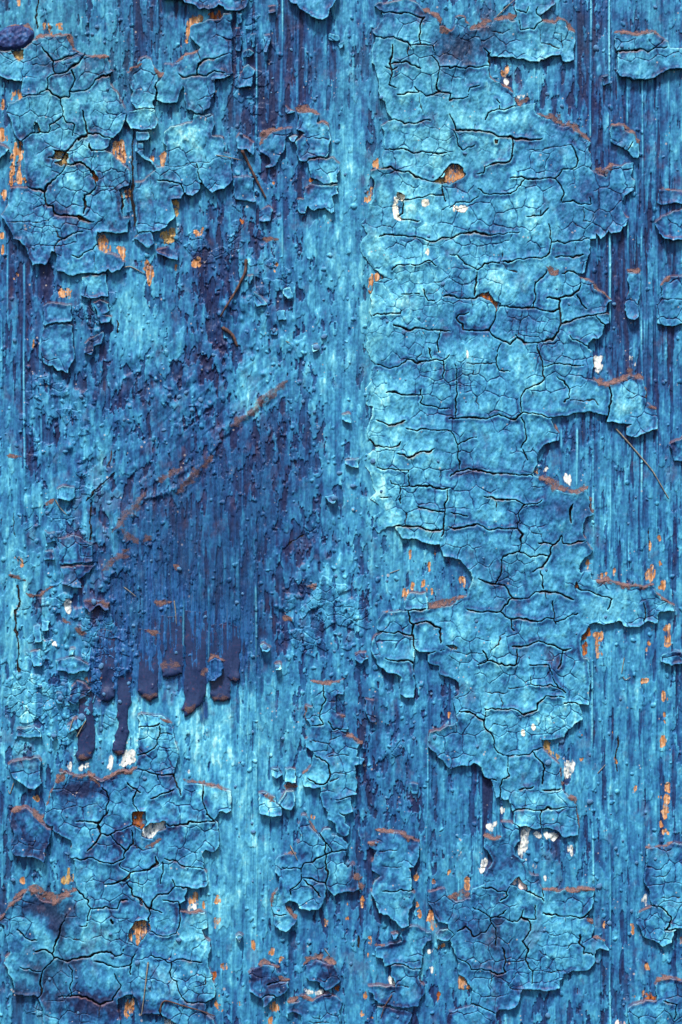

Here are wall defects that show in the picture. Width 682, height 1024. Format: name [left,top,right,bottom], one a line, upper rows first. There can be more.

crack [155,37,232,101]
crack [11,0,213,271]
rust [234,381,287,426]
crack [369,8,635,828]
rust [103,495,151,570]
rust [158,456,213,493]
peeling [247,0,682,1024]
rust [596,576,675,605]
crack [17,723,215,1017]
crack [274,833,347,916]
crack [458,887,593,1013]